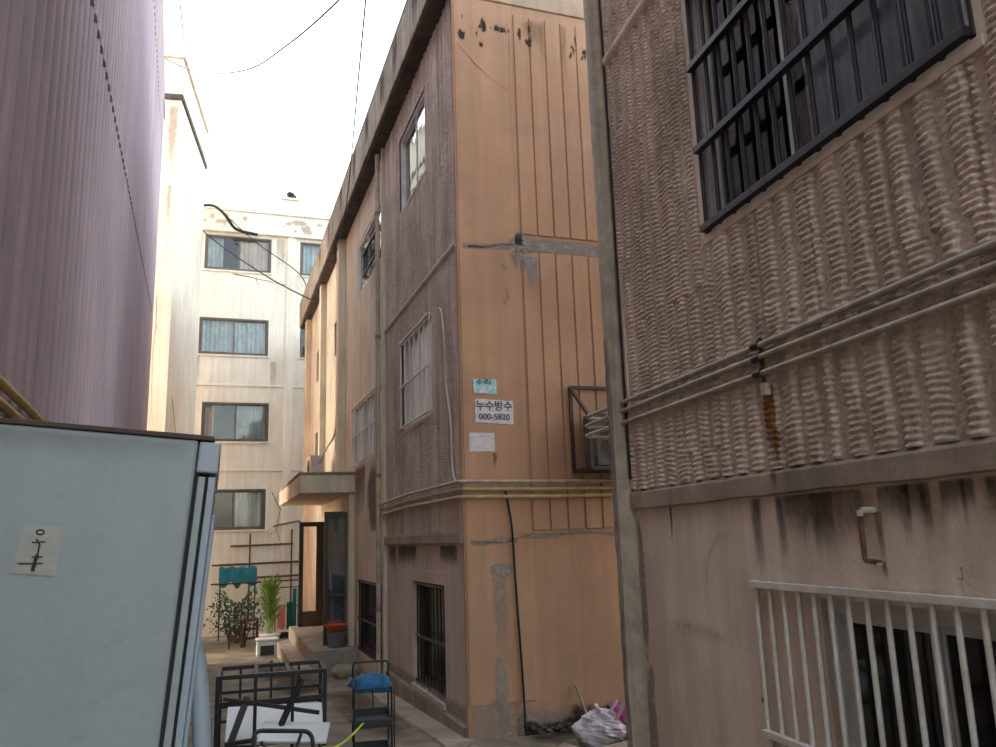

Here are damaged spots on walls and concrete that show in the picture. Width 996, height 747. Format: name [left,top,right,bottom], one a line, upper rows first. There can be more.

corrosion [762,385,781,455]
water stain [776,490,858,537]